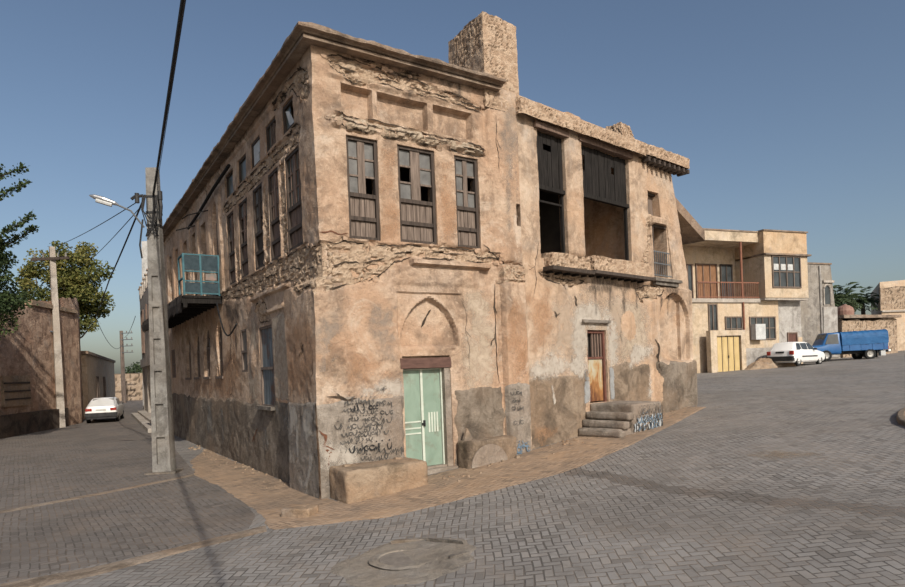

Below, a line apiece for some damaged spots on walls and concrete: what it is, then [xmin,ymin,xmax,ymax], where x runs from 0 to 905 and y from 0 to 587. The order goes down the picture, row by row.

flaking render [269,67,310,111]
flaking render [320,53,485,112]
flaking render [324,109,486,157]
flaking render [221,123,526,324]
flaking render [538,271,586,289]
crack [462,284,500,383]
water stain [301,444,358,488]